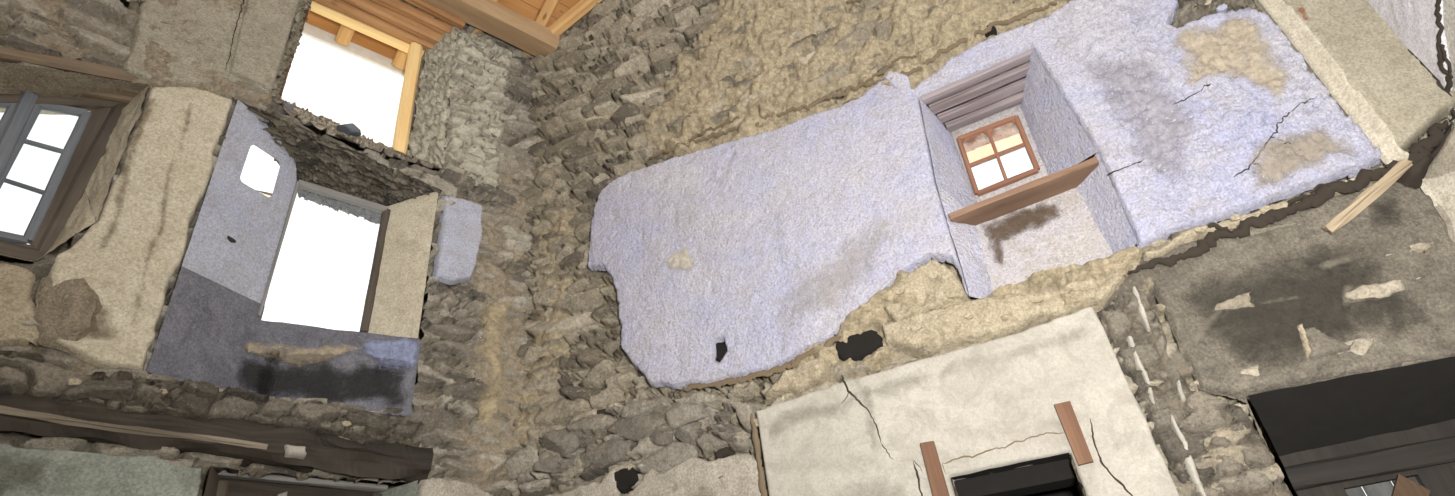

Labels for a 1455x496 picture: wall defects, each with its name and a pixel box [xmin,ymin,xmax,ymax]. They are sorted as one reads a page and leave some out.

peeling [884,72,911,90]
peeling [1172,0,1285,93]
crack [1128,0,1455,273]
peeling [1255,131,1343,185]
spalling [1143,193,1312,261]
spalling [504,357,830,495]
crack [679,331,1133,496]
spalling [883,259,1293,496]
peeling [1297,323,1354,359]